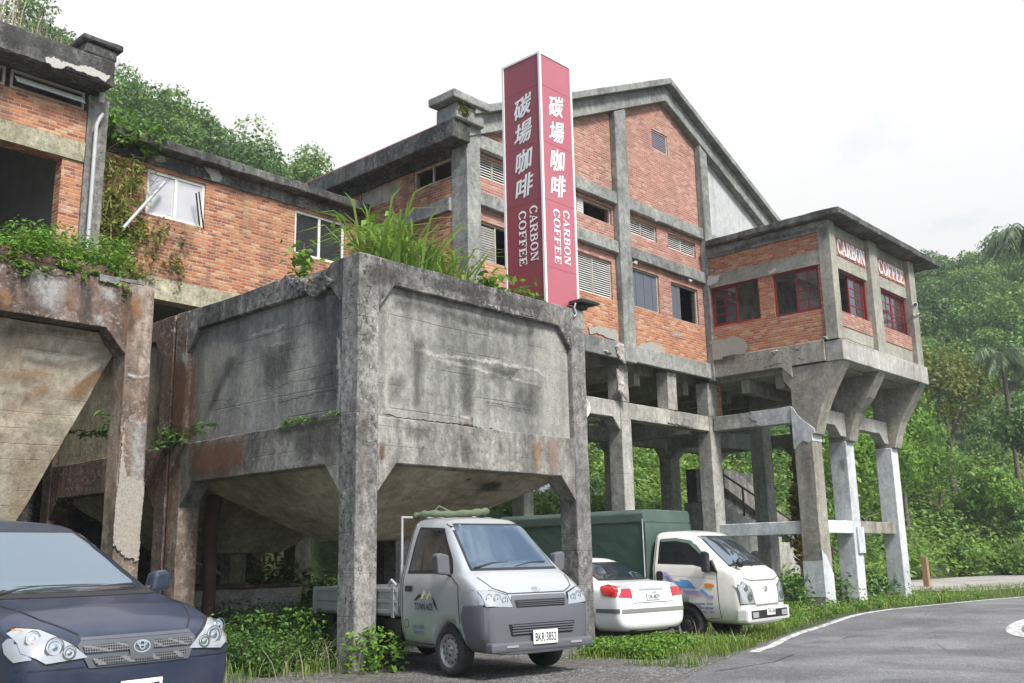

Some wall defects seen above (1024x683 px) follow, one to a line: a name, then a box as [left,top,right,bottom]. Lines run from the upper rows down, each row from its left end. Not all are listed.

peeling [45,56,110,82]
spalling [113,423,145,562]